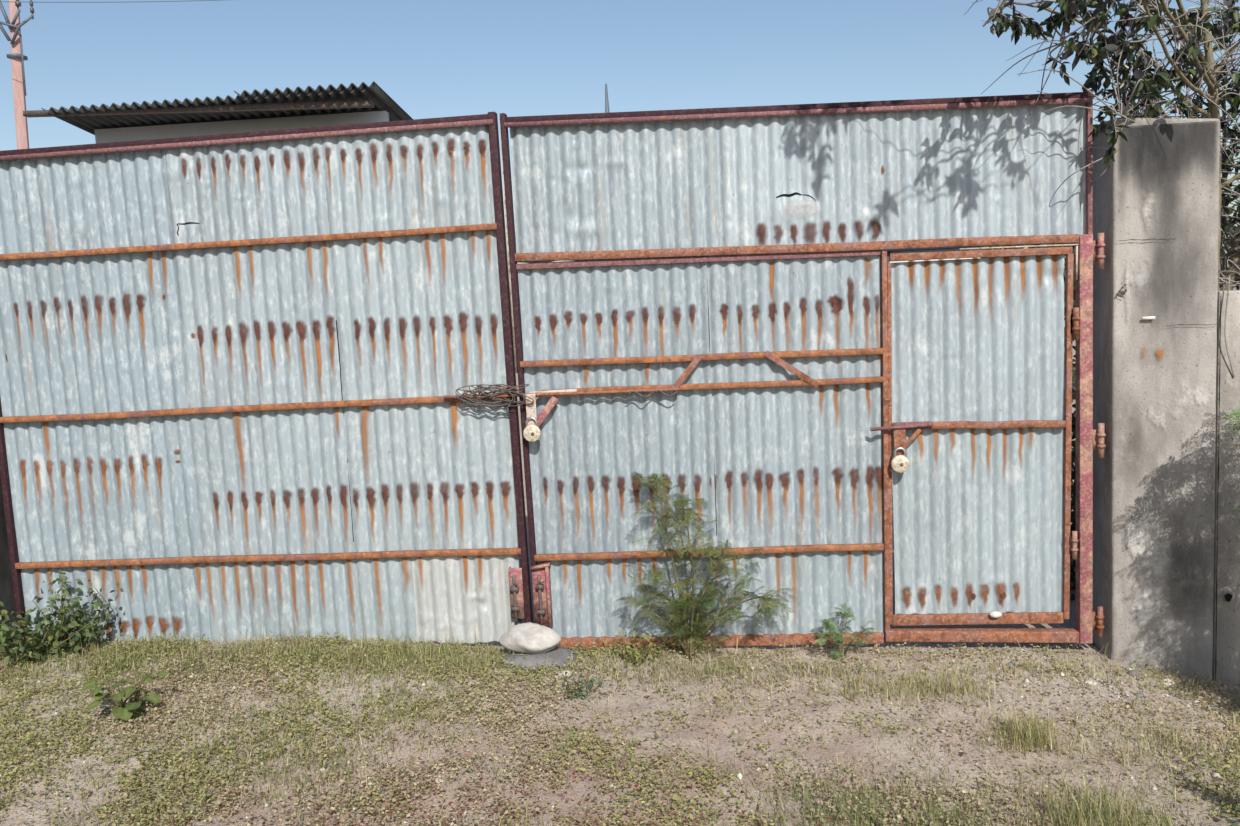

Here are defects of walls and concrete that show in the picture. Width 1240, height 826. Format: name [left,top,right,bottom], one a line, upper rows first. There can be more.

corrosion [182,139,485,185]
corrosion [757,221,880,245]
corrosion [14,251,166,339]
corrosion [191,317,334,382]
corrosion [354,313,497,369]
corrosion [535,305,695,353]
corrosion [720,258,879,346]
corrosion [909,255,1057,306]
corrosion [20,421,161,505]
corrosion [213,482,510,538]
corrosion [544,468,818,528]
corrosion [903,583,1020,606]